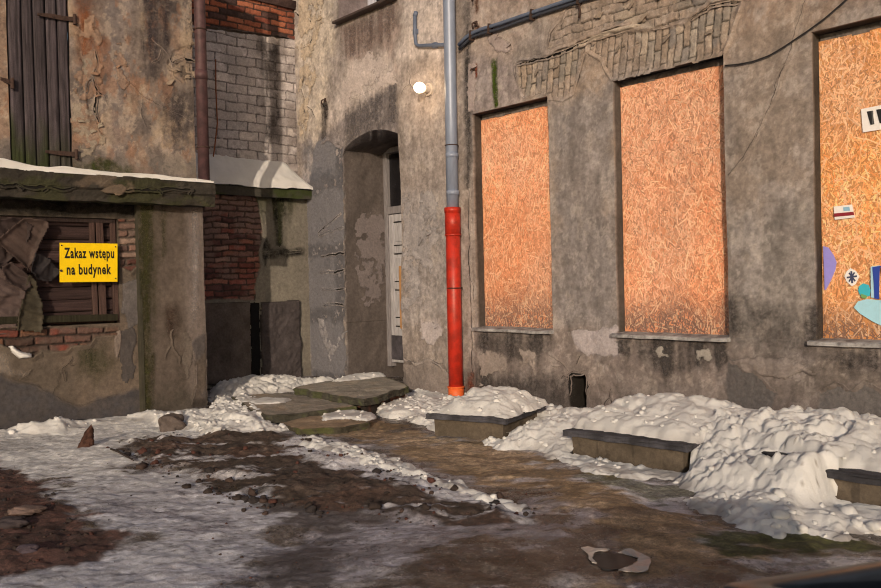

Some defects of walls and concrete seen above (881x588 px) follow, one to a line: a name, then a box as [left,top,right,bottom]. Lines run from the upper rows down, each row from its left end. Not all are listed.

flaking render [70,3,106,159]
flaking render [167,16,195,85]
water stain [261,41,279,140]
flaking render [296,0,324,137]
flaking render [467,62,477,112]
flaking render [487,0,745,102]
crack [727,0,808,176]
flaking render [307,136,386,380]
flaking render [571,324,620,357]